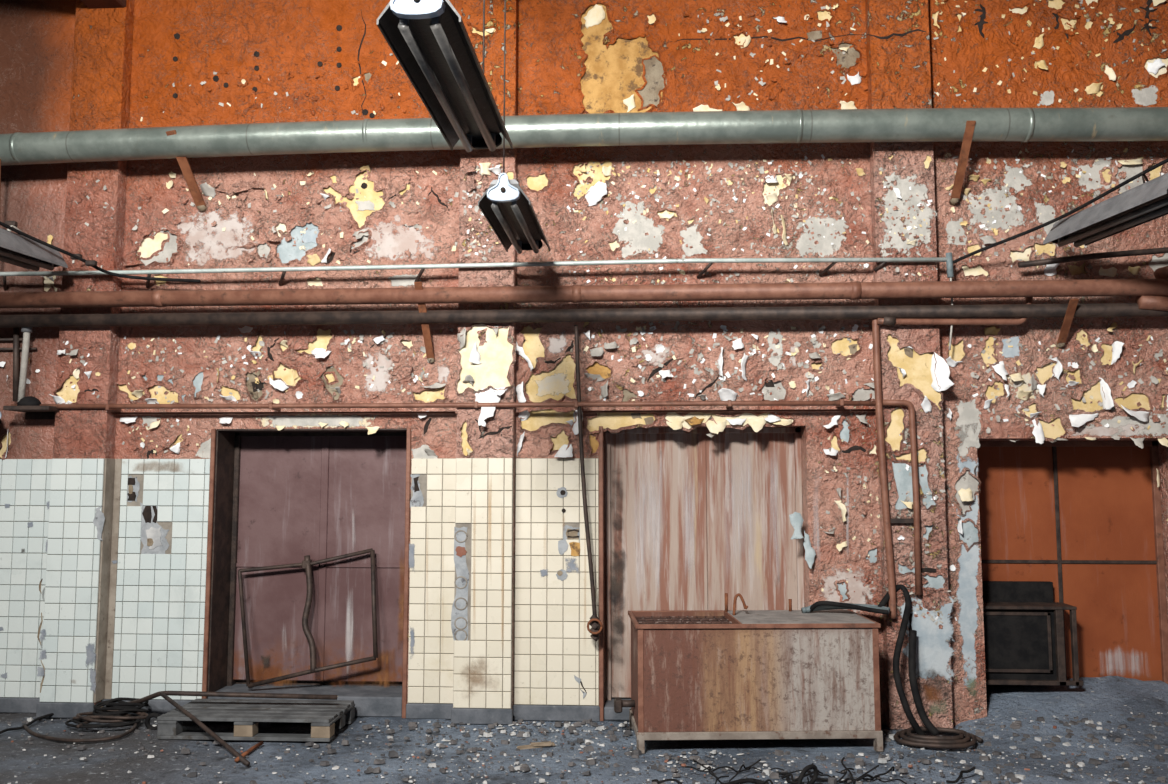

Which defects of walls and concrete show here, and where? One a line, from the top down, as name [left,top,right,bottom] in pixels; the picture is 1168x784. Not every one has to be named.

crack [358,11,366,116]
peeling [578,1,670,114]
crack [974,4,988,38]
crack [1113,0,1157,43]
peeling [122,147,1168,289]
peeling [41,276,61,292]
peeling [49,341,102,417]
spalling [93,505,105,541]
peeling [116,322,1168,687]